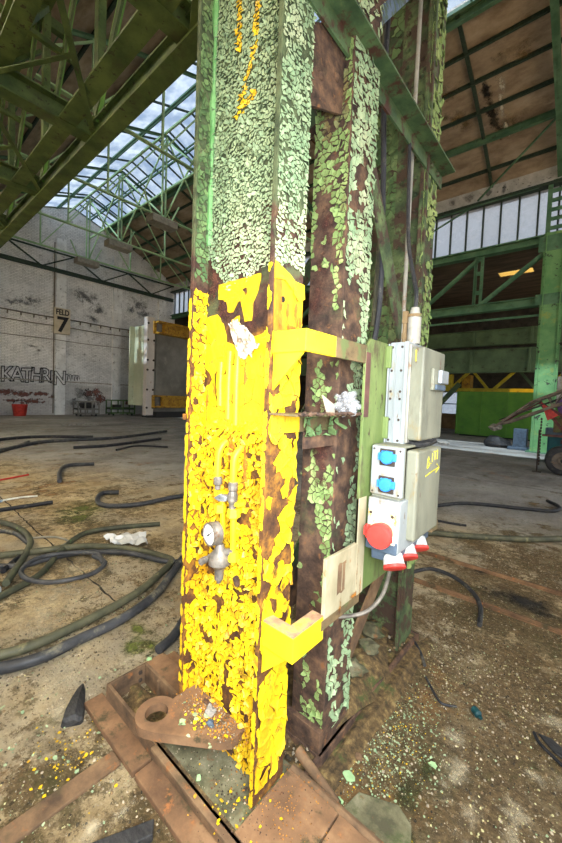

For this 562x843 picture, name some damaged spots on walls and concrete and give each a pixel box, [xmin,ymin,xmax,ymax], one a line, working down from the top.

peeling [428,0,448,142]
damp [475,77,510,140]
peeling [418,172,437,348]
peeling [170,0,406,834]
rust [312,446,328,486]
rust [337,560,361,611]